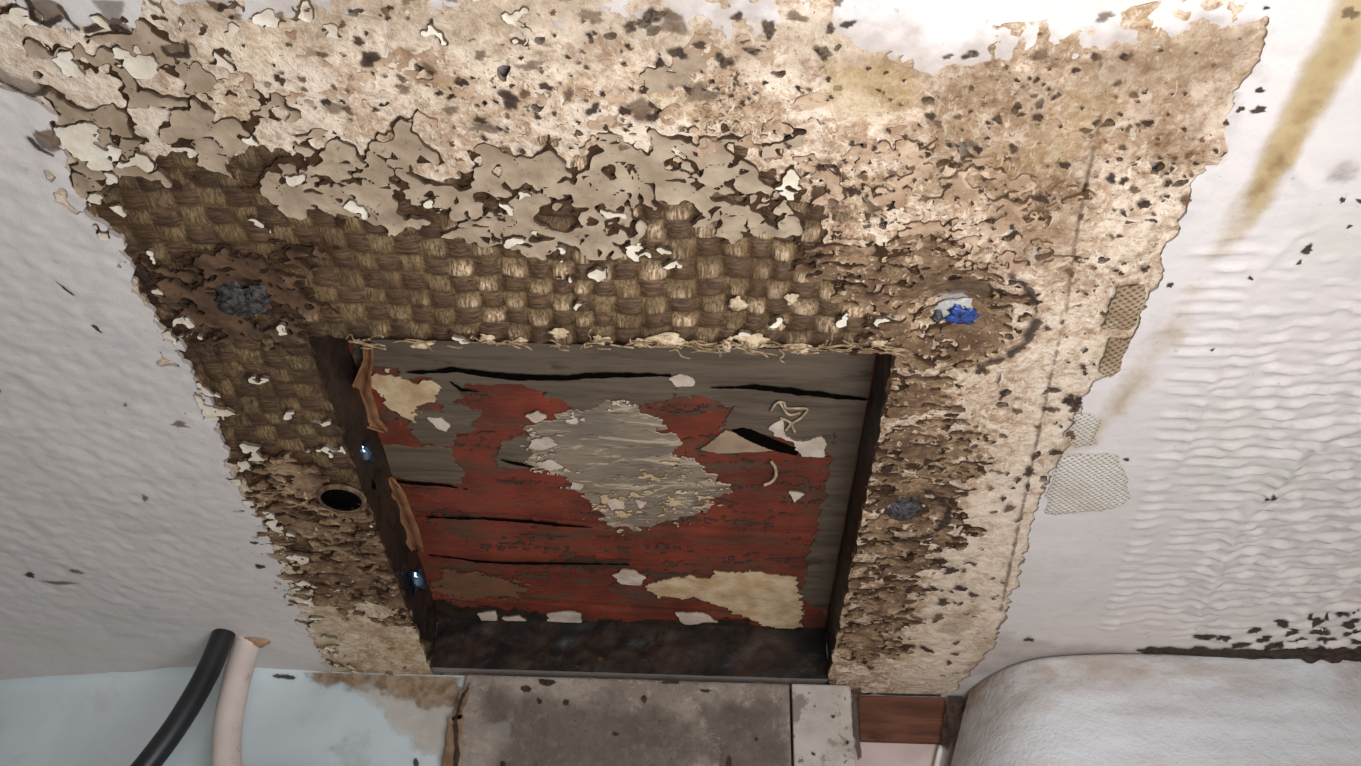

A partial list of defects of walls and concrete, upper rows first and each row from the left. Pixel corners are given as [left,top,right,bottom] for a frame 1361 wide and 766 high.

leakage [1223,87,1267,125]
peeling [132,216,339,364]
peeling [587,266,608,283]
peeling [655,245,682,270]
peeling [728,296,749,311]
peeling [835,310,849,328]
peeling [193,380,238,430]
peeling [352,315,894,629]
peeling [848,454,923,593]
peeling [225,441,485,748]
peeling [1193,610,1361,651]
leakage [521,679,556,704]